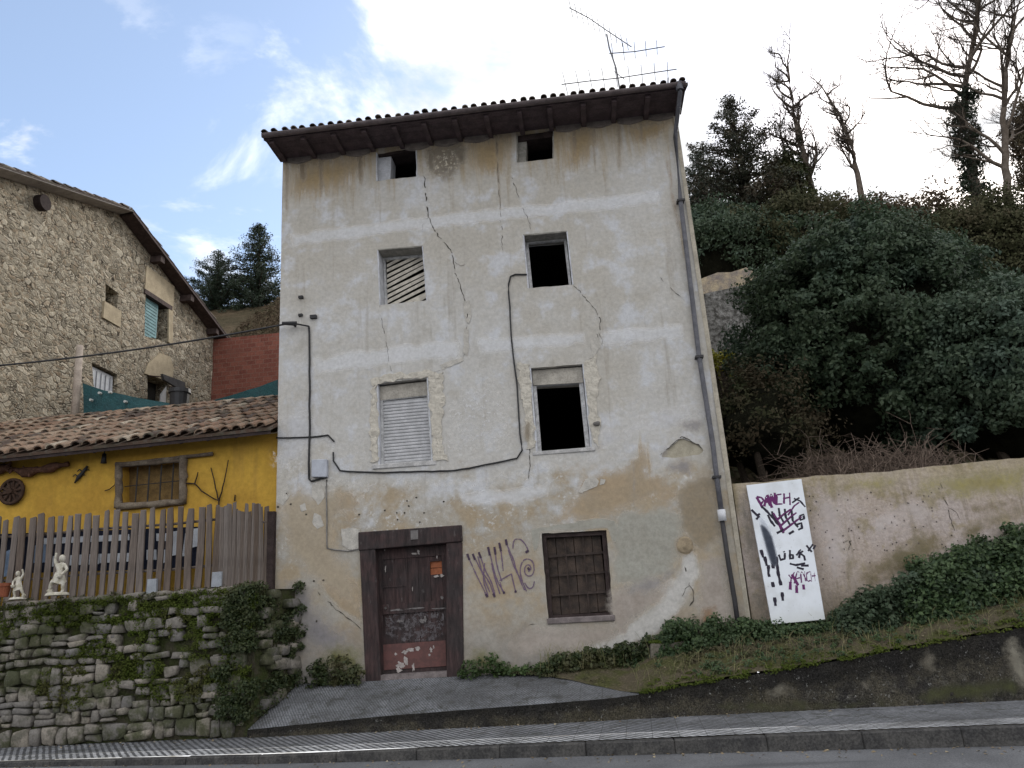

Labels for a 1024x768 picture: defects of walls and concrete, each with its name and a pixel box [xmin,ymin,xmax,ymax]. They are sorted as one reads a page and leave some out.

water stain [286,156,365,207]
water stain [428,136,505,181]
water stain [567,127,596,165]
crack [422,177,472,372]
spalling [661,436,703,458]
water stain [670,462,718,548]
water stain [295,589,344,651]